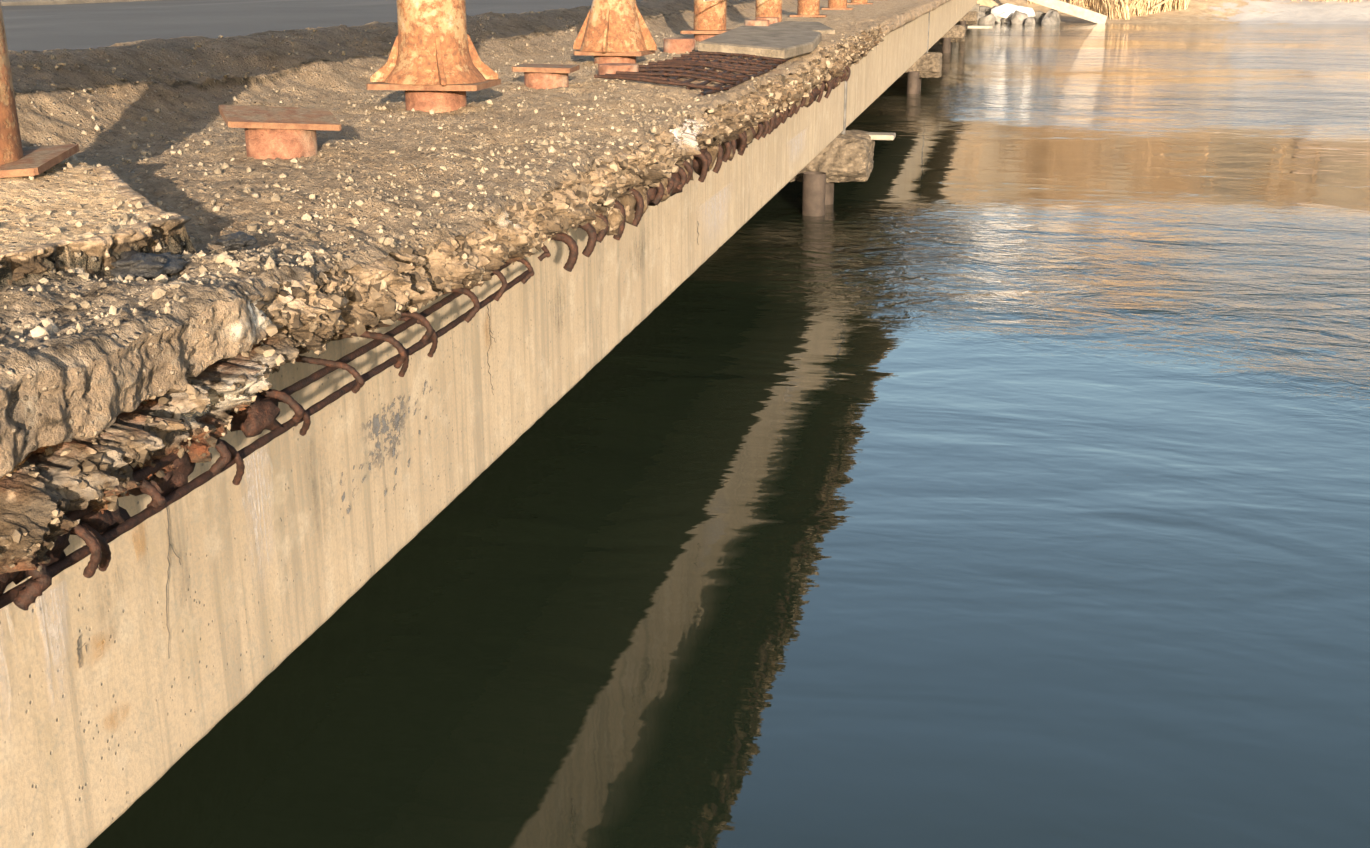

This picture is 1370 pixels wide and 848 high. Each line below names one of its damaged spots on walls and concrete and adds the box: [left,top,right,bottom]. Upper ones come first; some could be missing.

crack [166,507,181,653]
spalling [0,24,885,623]